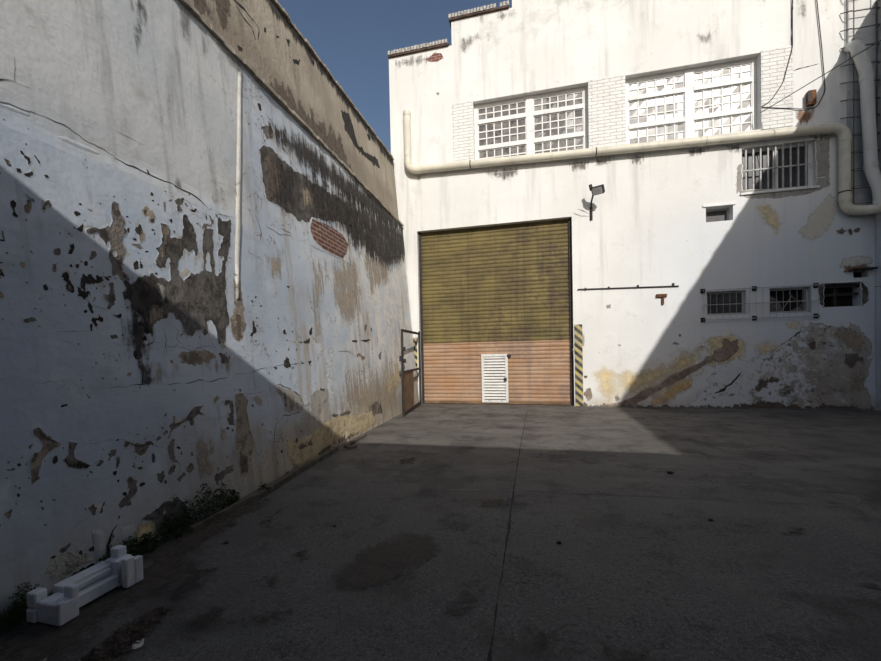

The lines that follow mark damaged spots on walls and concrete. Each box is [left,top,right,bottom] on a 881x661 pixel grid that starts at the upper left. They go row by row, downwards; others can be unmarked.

leakage [277,7,354,110]
crack [0,101,235,234]
spalling [245,97,349,260]
leakage [269,78,405,342]
spalling [52,191,262,367]
spalling [860,282,870,307]
leakage [583,336,744,408]
spalling [607,322,872,409]
spalling [7,382,383,519]
spalling [136,494,189,542]
crack [487,413,527,661]